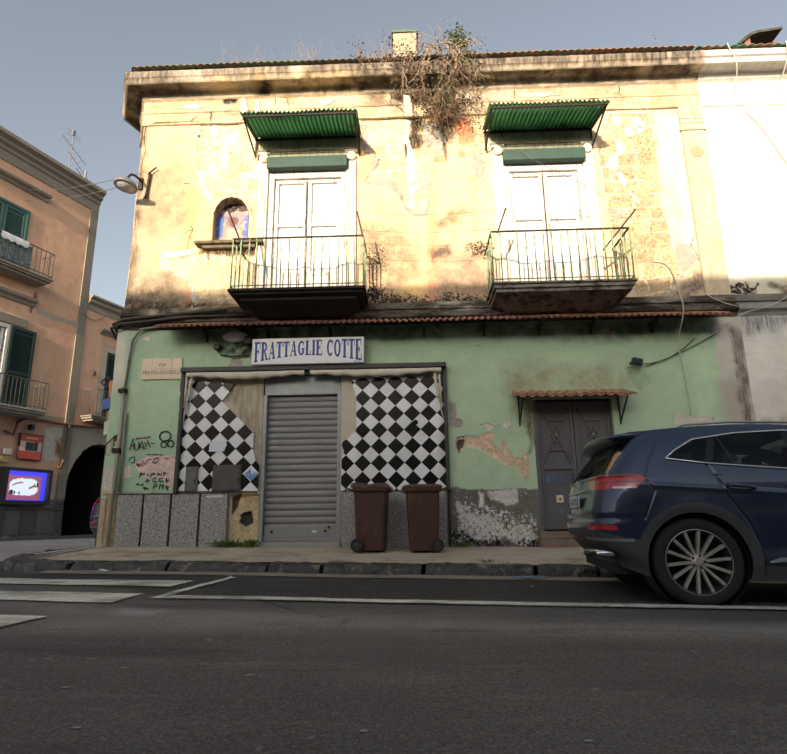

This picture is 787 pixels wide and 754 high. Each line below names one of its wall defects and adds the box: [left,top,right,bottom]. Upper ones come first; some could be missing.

spalling [196,124,260,200]
spalling [359,115,493,214]
spalling [598,112,680,297]
spalling [163,249,255,307]
damp [358,230,488,303]
damp [463,241,497,265]
peeling [448,401,463,427]
peeling [675,413,723,427]
peeling [453,421,530,479]
spalling [229,491,259,546]
damp [451,490,540,547]
peeling [456,488,537,547]